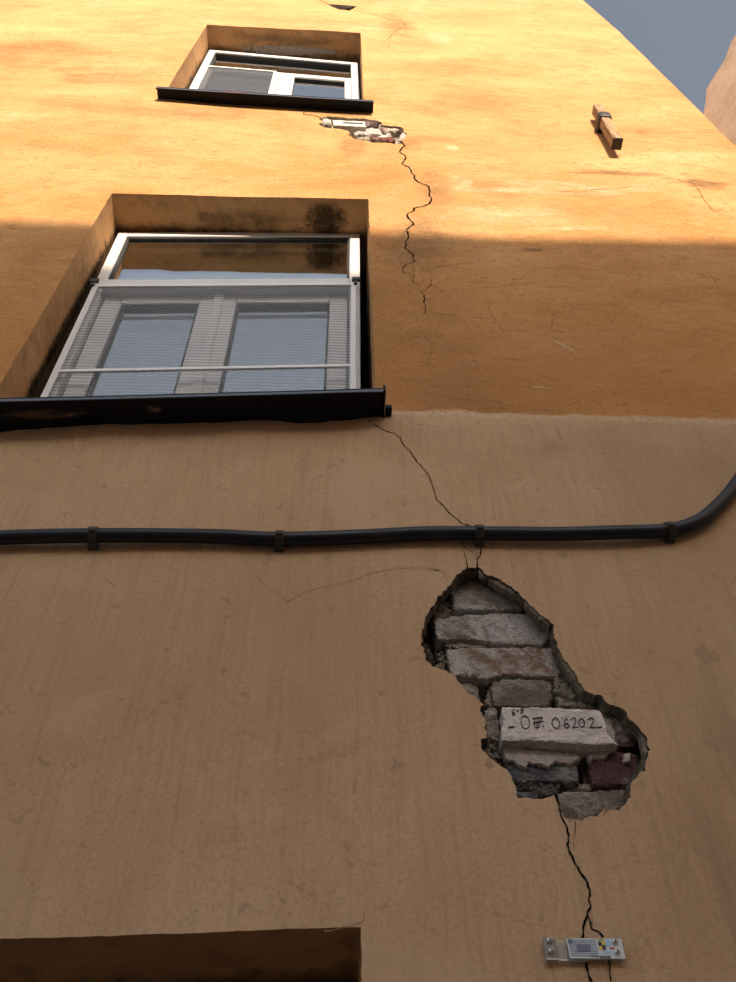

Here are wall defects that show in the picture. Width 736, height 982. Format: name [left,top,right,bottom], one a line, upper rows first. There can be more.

spalling [318,116,407,144]
crack [398,141,536,428]
spalling [421,567,650,821]
crack [555,794,612,982]